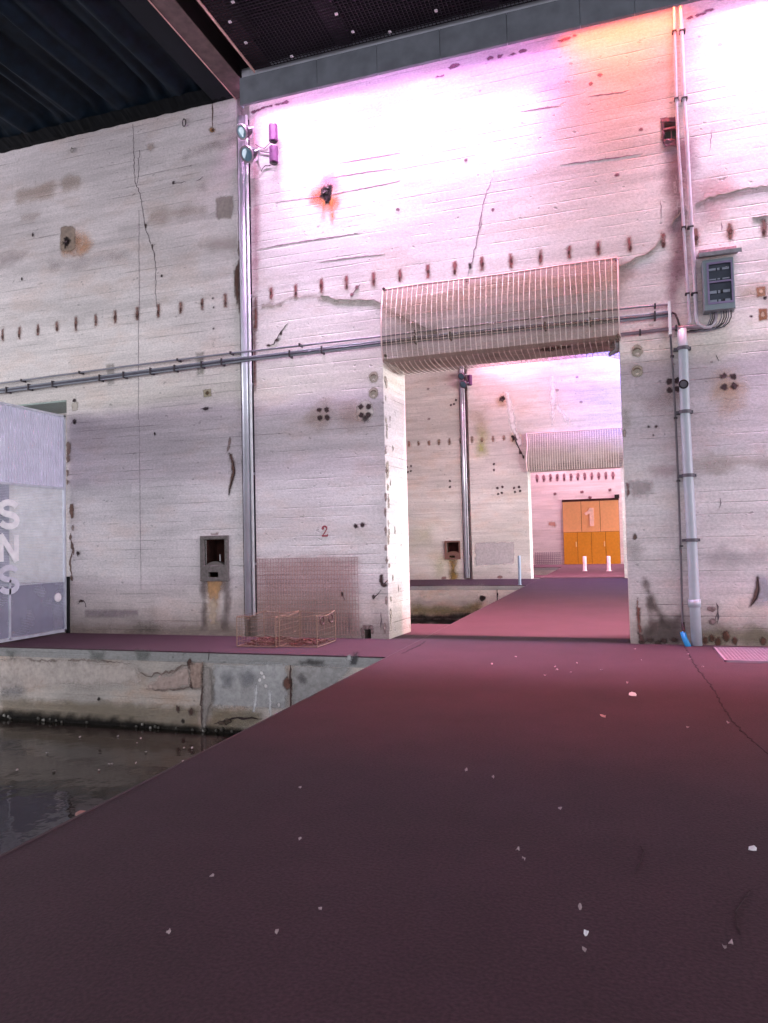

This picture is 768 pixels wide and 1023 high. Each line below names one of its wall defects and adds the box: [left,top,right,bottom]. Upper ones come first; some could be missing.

rust [60,226,76,251]
rust [313,184,334,217]
crack [466,178,493,284]
crack [133,136,157,473]
rust [201,581,229,627]
peeling [0,658,212,732]
damp [0,671,280,734]
crack [684,646,768,754]